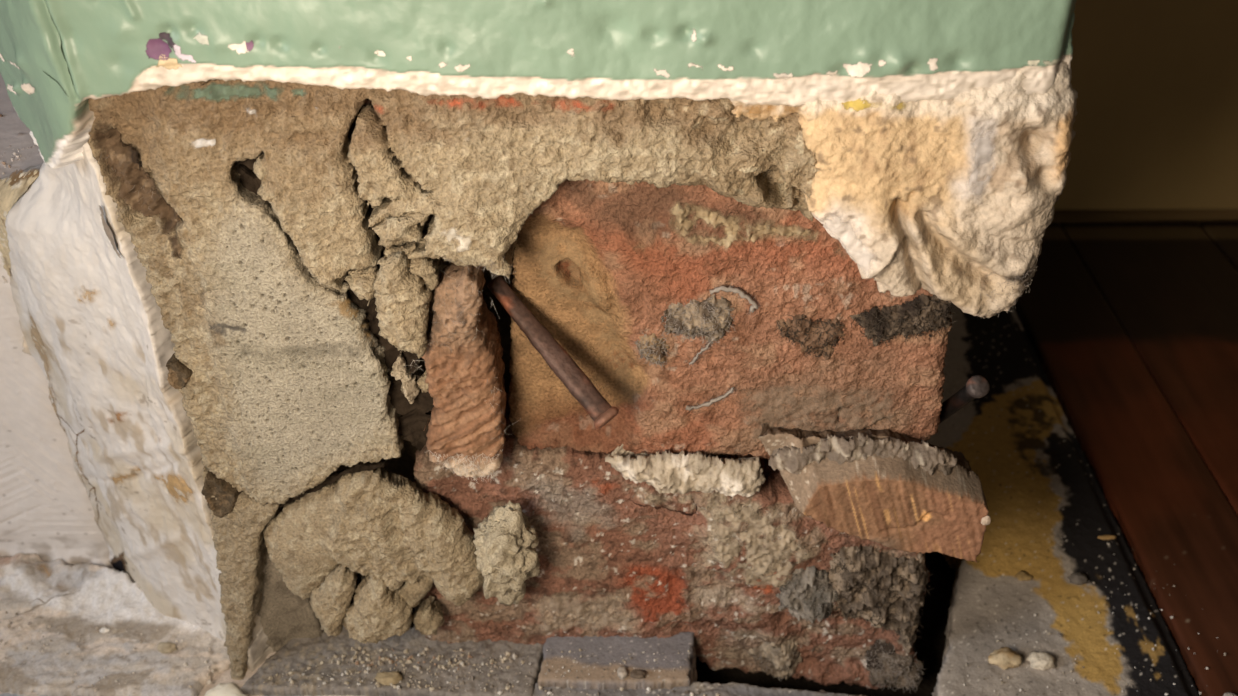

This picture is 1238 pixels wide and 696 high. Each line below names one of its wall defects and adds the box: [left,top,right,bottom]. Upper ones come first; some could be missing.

spalling [90,124,183,259]
flaking render [672,204,814,248]
spalling [166,353,193,389]
crack [53,401,100,529]
spalling [201,471,242,518]
spalling [257,555,324,652]